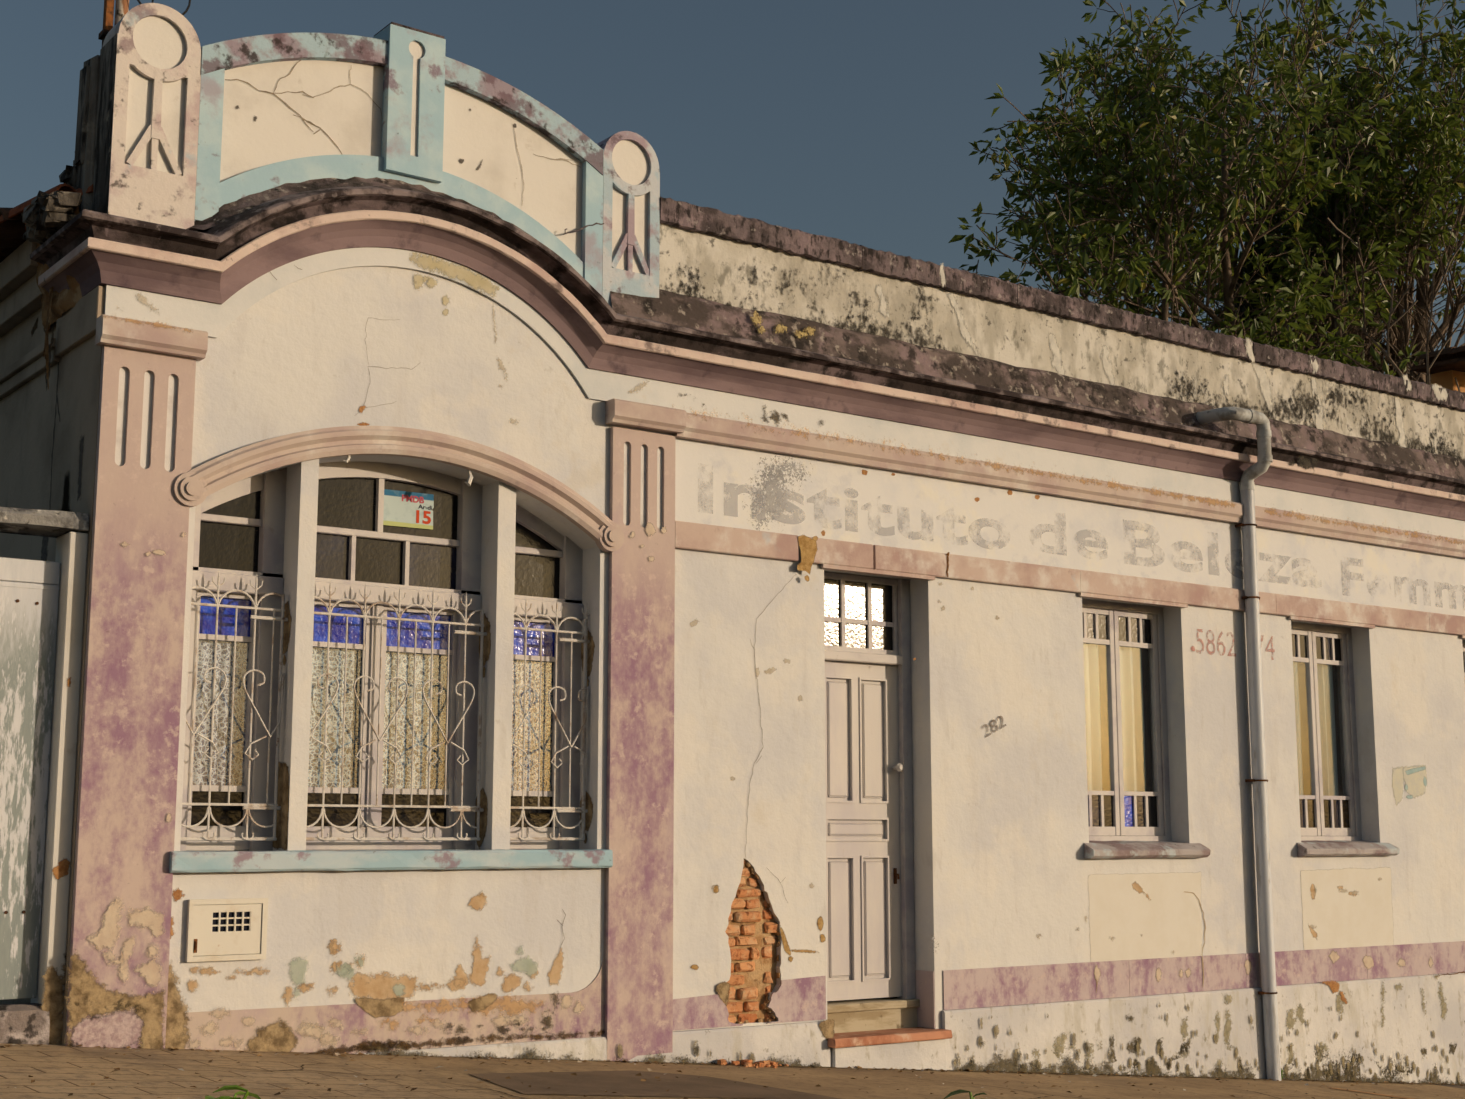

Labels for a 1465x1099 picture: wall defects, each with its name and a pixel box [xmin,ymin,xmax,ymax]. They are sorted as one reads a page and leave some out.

crack [225,60,382,154]
water stain [666,264,981,356]
water stain [762,407,788,426]
water stain [1167,338,1464,460]
flaking render [797,535,818,582]
crack [745,575,795,903]
peeling [88,899,164,987]
flaking render [712,859,826,1024]
peeling [70,1011,144,1048]
peeling [283,938,584,1045]
water stain [954,995,1259,1079]
water stain [1280,974,1464,1084]